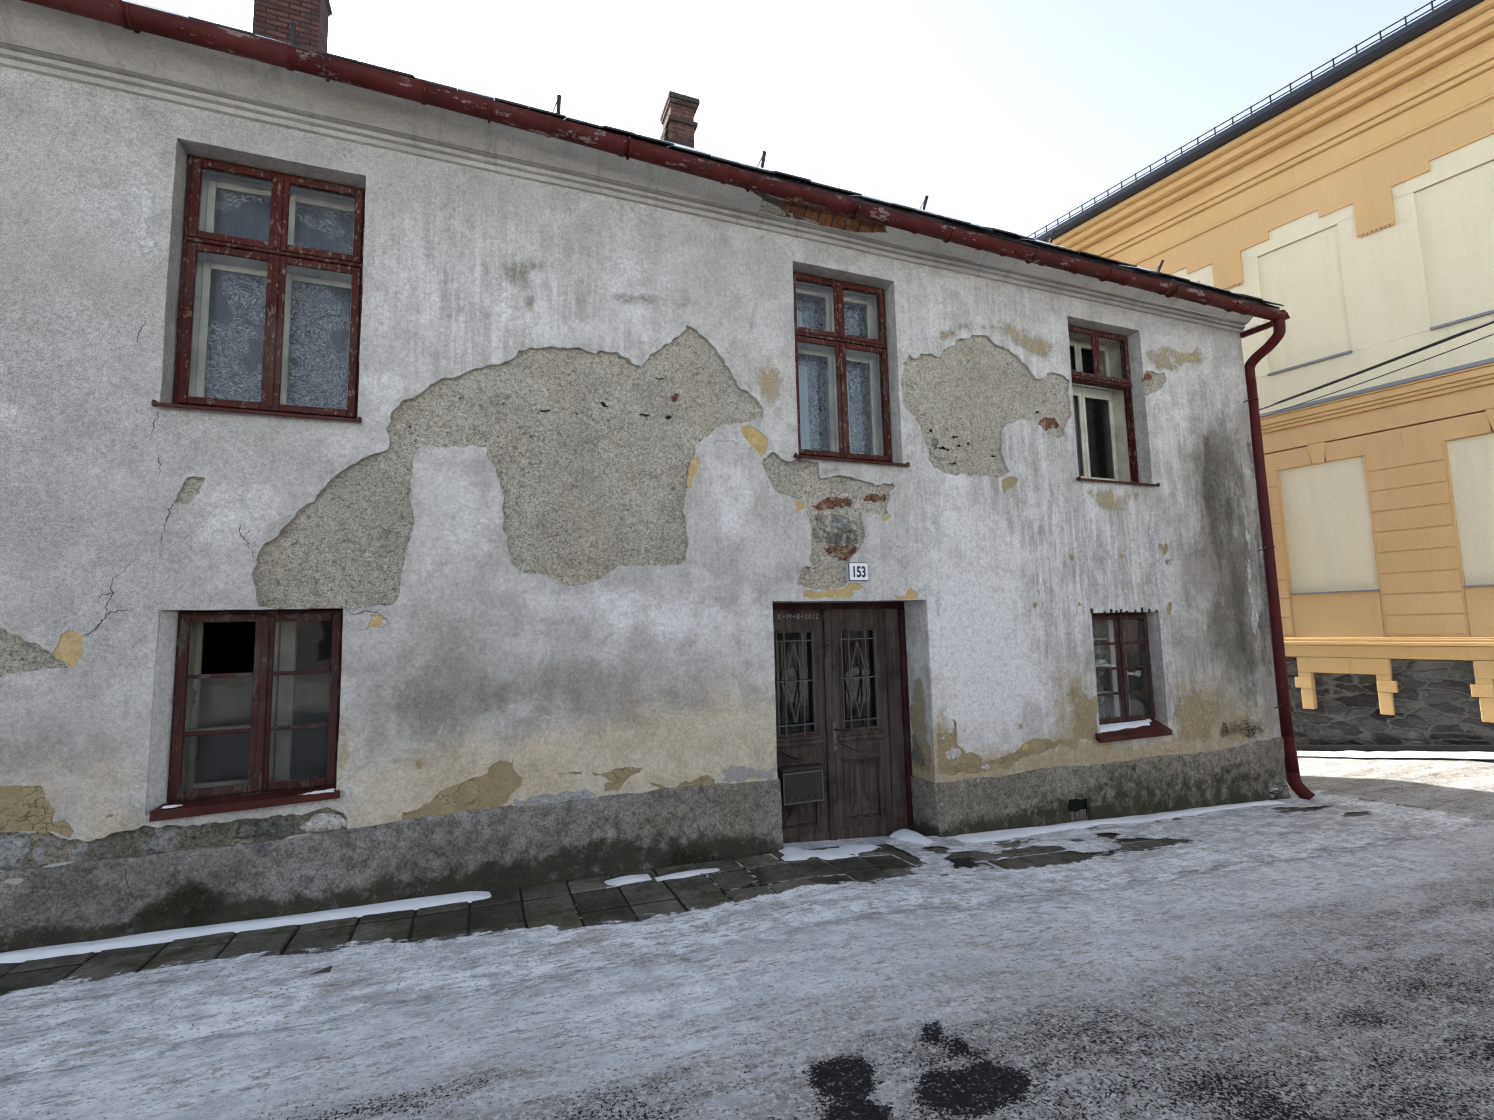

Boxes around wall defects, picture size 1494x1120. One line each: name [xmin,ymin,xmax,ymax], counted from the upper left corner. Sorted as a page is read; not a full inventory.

flaking render [900,336,1069,493]
flaking render [253,326,893,628]
leakage [1196,431,1269,693]
flaking render [0,628,84,677]
leakage [1169,692,1266,739]
peeling [937,719,1077,776]
peeling [402,760,538,820]
peeling [558,767,715,791]
flaking render [0,785,348,870]